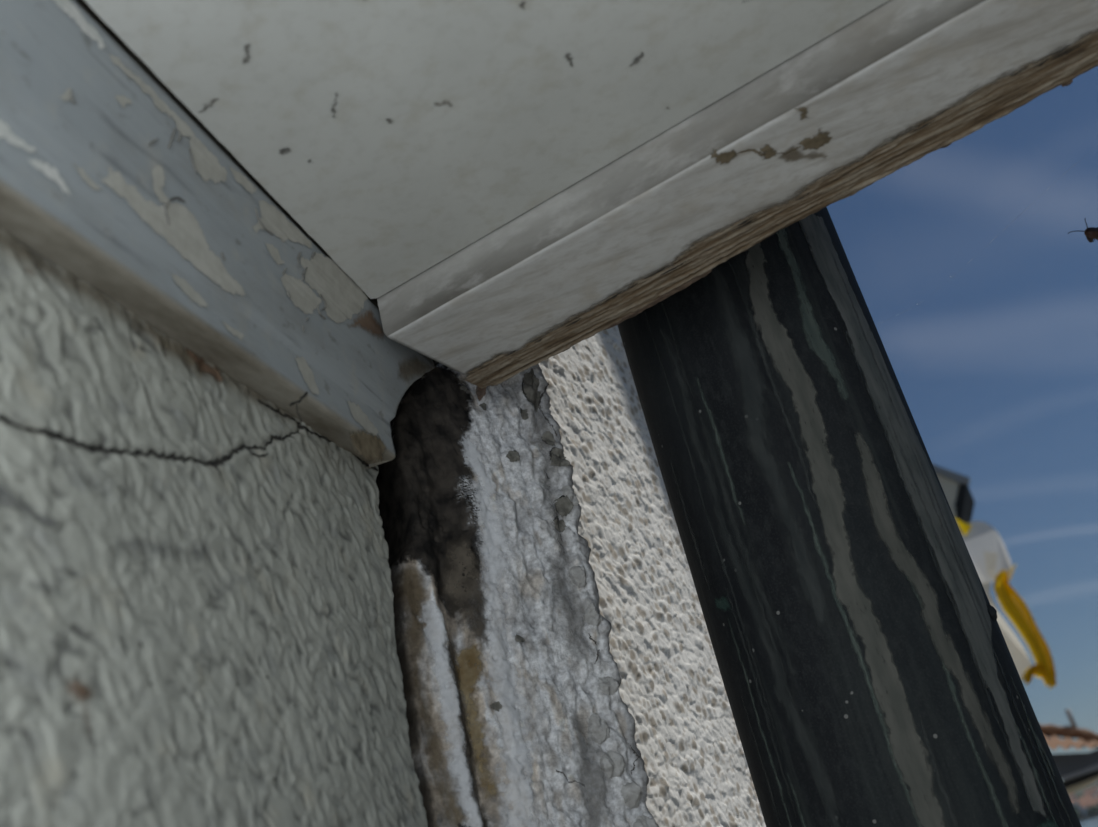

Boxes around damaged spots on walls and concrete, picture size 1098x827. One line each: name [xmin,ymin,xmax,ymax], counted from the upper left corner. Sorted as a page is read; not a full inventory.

peeling [0,119,71,196]
peeling [54,0,368,331]
peeling [462,31,1098,420]
crack [0,392,378,481]
spalling [506,450,520,462]
spalling [542,431,570,466]
spalling [553,495,574,532]